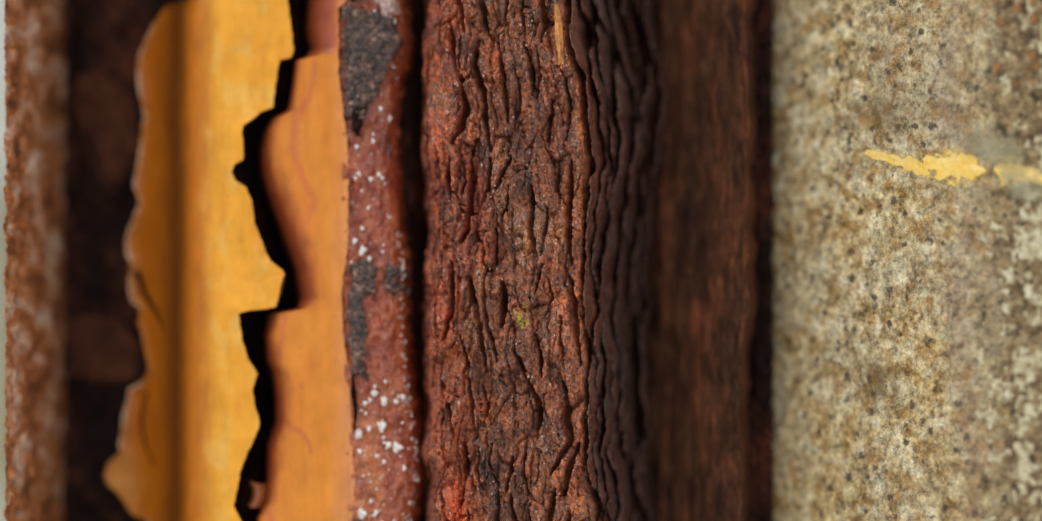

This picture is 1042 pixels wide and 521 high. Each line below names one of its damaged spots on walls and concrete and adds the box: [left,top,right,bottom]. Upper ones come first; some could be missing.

peeling [104,0,410,521]
peeling [421,0,671,521]